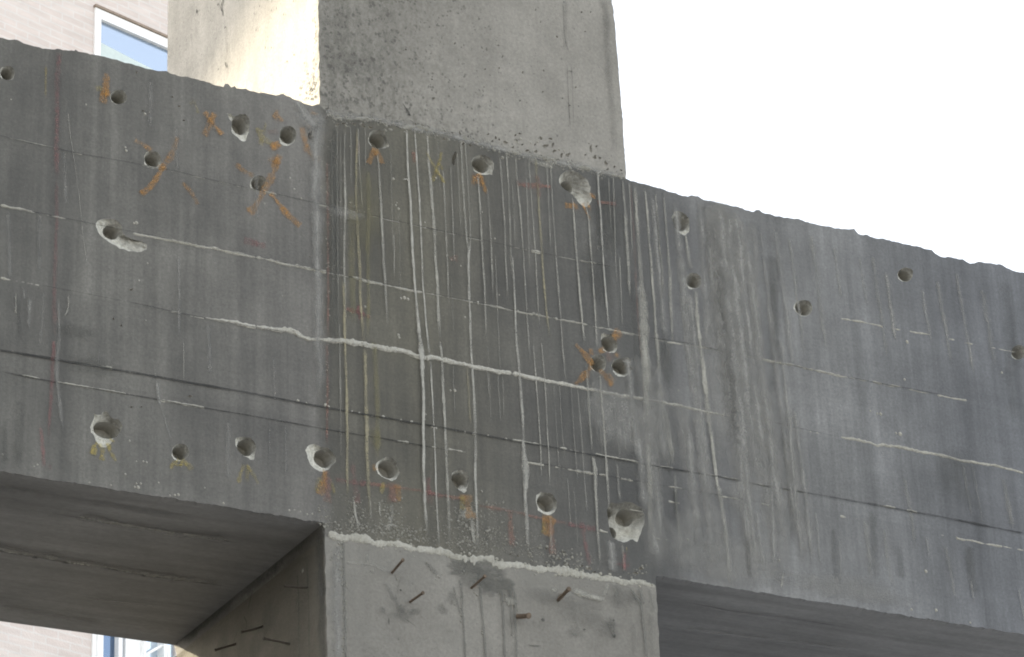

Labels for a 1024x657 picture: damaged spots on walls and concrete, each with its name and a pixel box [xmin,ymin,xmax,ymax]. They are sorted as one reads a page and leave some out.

spalling [559,170,592,207]
spalling [96,219,148,264]
leakage [296,101,395,486]
leakage [405,132,560,533]
leakage [572,171,817,577]
spalling [90,411,131,447]
spalling [608,502,645,542]